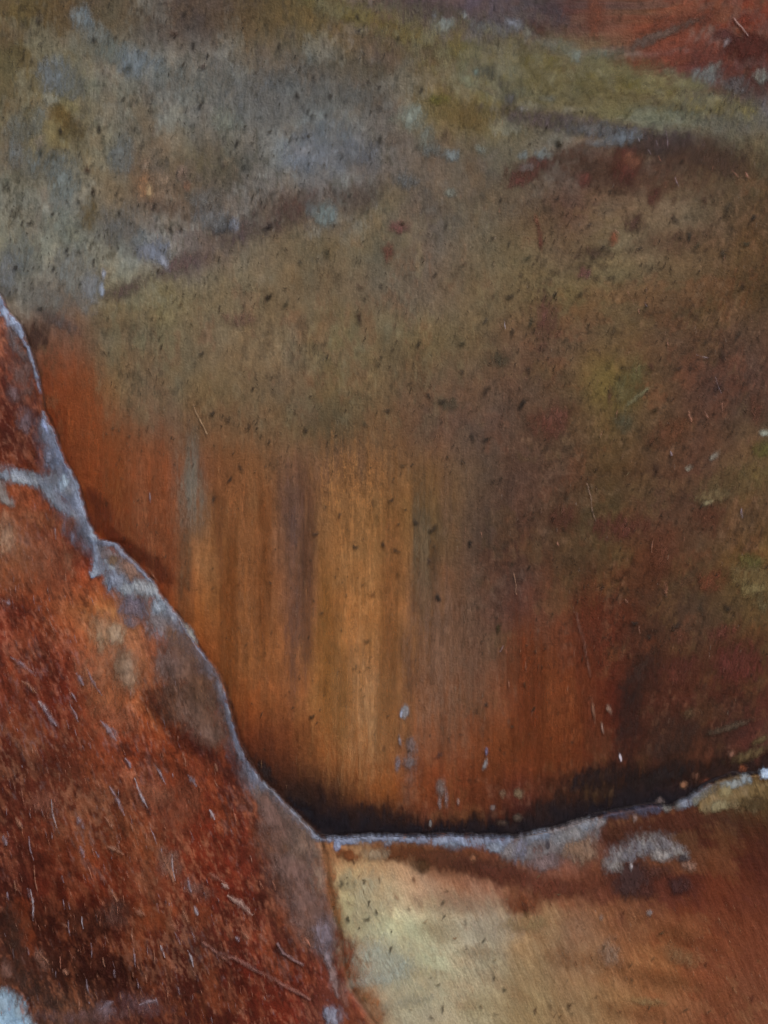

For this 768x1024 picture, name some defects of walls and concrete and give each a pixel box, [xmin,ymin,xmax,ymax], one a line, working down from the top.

crack [0,292,207,658]
leakage [0,410,768,957]
rust [323,843,615,1024]
crack [226,686,763,882]